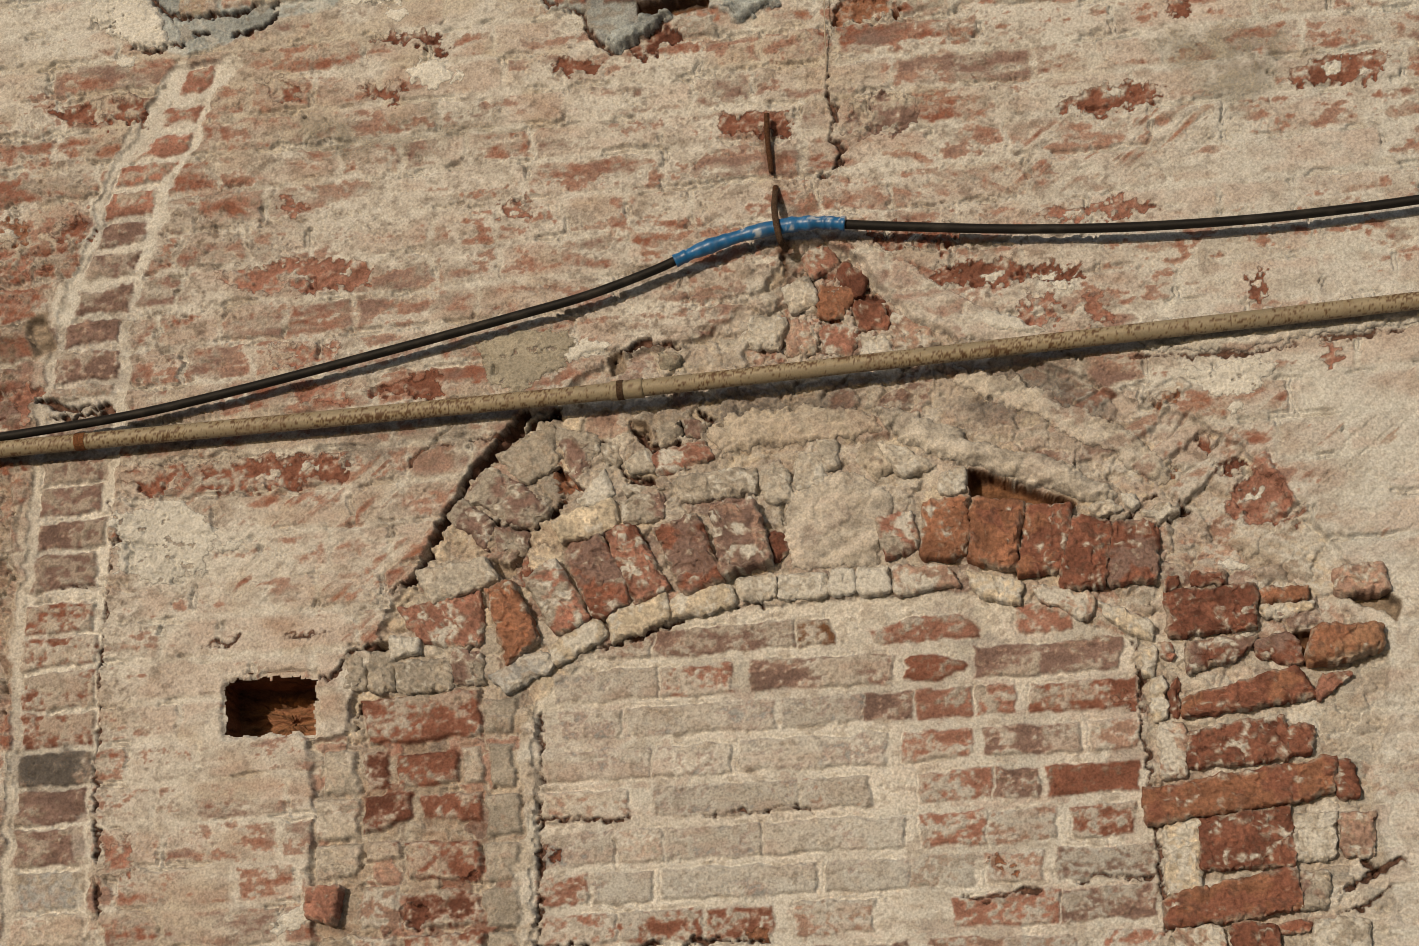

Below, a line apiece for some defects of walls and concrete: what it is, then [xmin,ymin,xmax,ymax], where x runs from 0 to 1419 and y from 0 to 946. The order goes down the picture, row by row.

flaking render [89,0,174,67]
spalling [625,21,683,63]
spalling [823,0,906,28]
crack [820,75,847,180]
crack [402,410,562,589]
crack [495,468,585,532]
spalling [1193,431,1307,530]
flaking render [1218,558,1250,570]
crack [63,502,122,915]
crack [1131,641,1154,786]
spalling [986,852,1020,877]
crack [1080,827,1168,933]